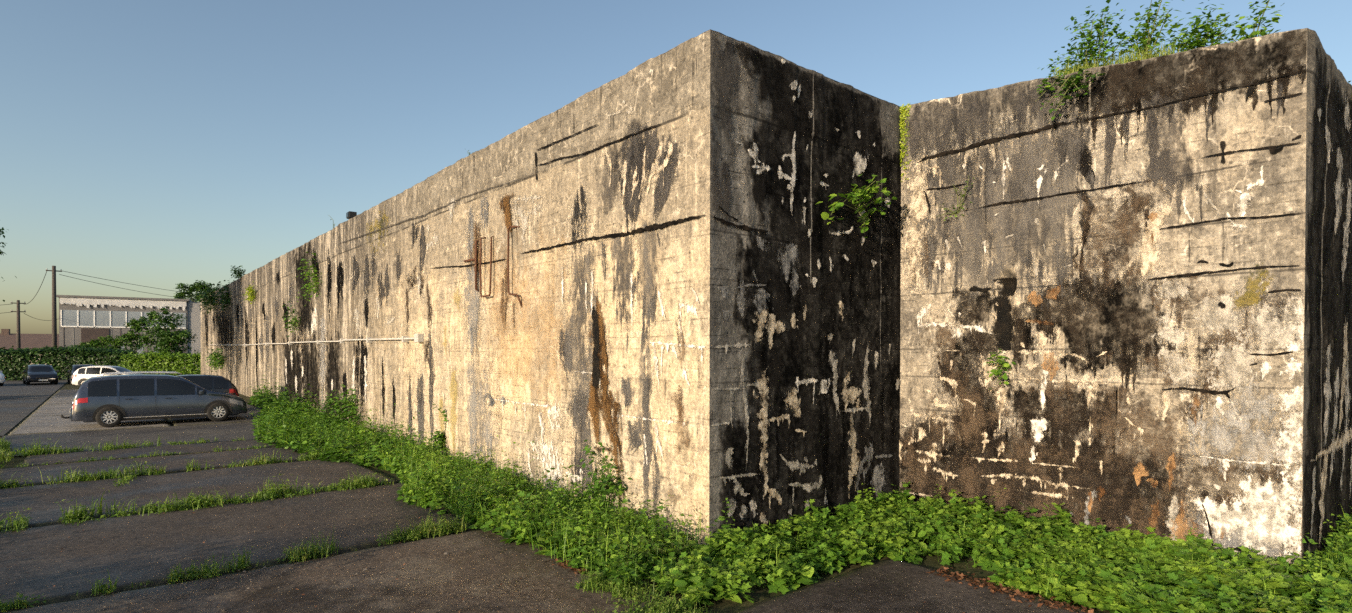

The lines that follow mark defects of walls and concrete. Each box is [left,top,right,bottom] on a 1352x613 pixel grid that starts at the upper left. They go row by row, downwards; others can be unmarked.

rust [464,193,522,335]
damp [205,30,1352,560]
rust [586,296,623,504]